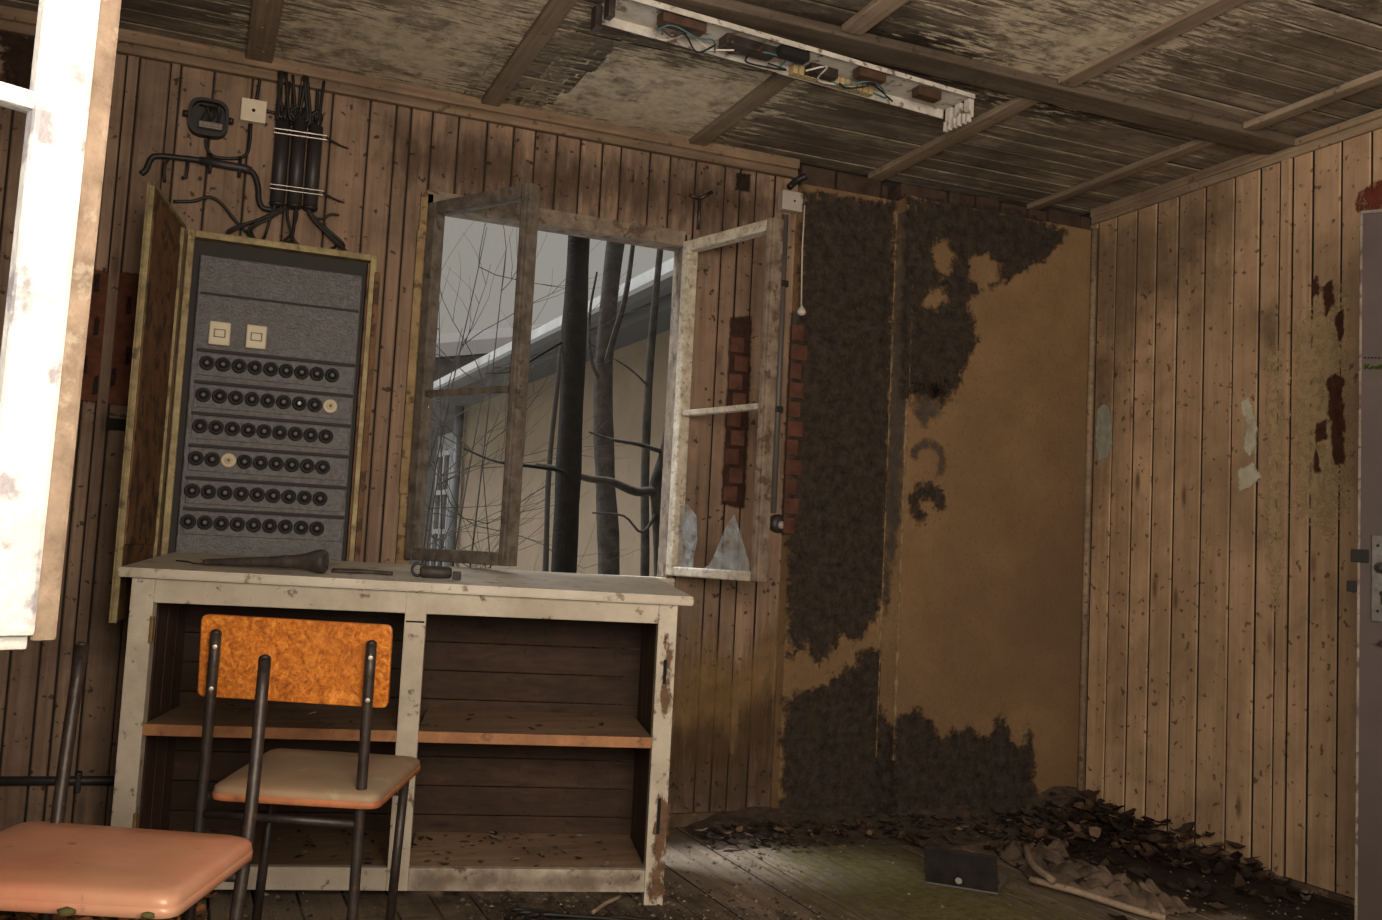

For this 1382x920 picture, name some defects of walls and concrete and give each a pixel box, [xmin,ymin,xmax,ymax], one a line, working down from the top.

spalling [781,313,807,535]